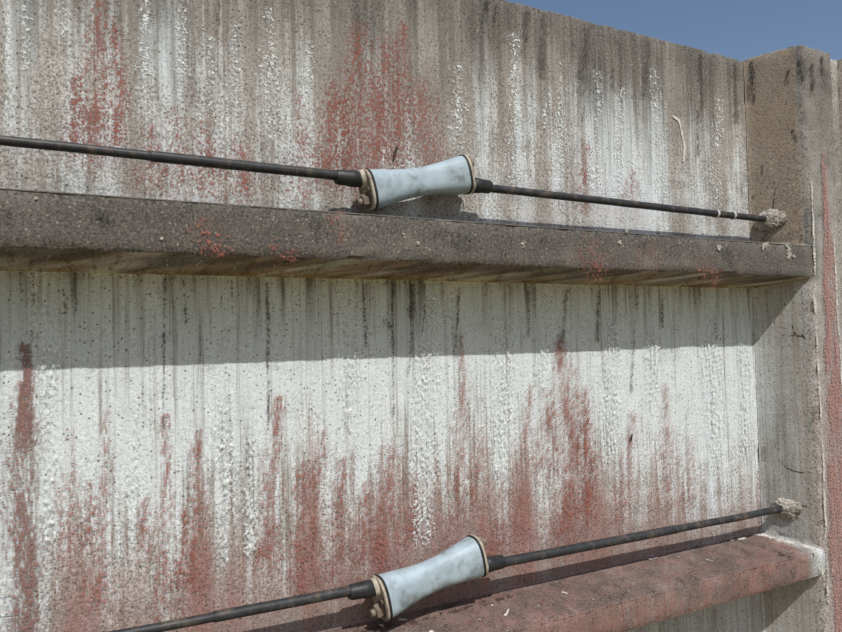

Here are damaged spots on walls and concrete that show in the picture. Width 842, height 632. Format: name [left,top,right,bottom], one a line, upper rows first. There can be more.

leakage [63,0,151,145]
leakage [135,161,252,202]
leakage [260,8,283,138]
leakage [292,22,466,170]
leakage [504,11,531,178]
leakage [577,25,639,201]
leakage [734,60,755,122]
leakage [784,56,824,92]
leakage [214,267,639,593]
leakage [703,305,726,477]
leakage [136,414,211,622]